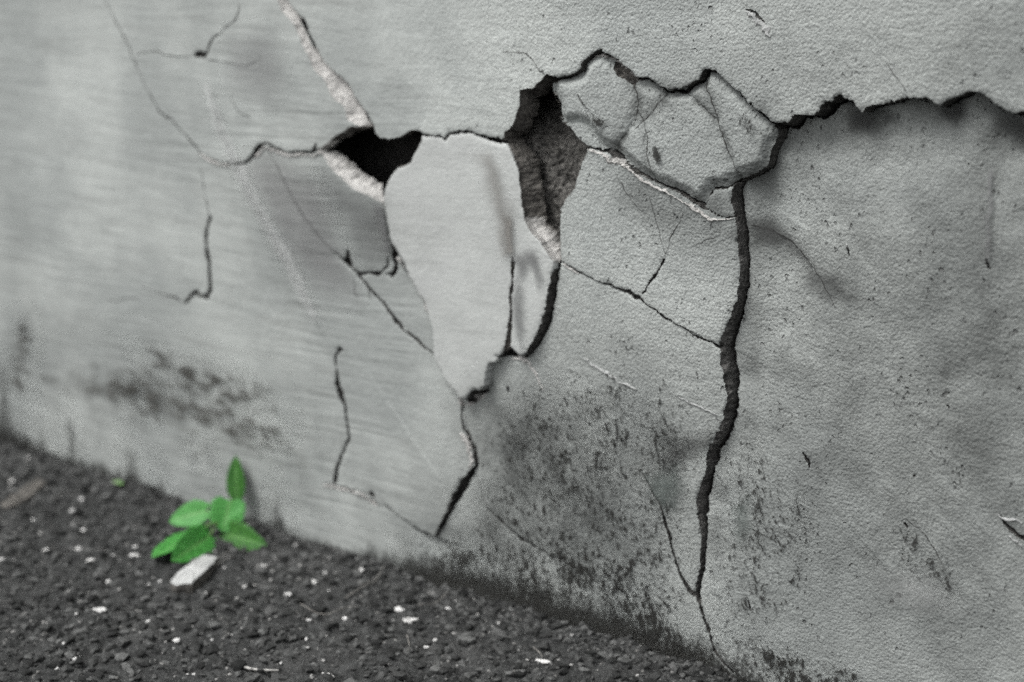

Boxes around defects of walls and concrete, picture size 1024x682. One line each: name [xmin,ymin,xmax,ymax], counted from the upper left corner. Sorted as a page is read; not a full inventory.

damp [0,398,139,484]
crack [105,0,433,353]
crack [323,347,567,558]
peeling [317,74,591,399]
crack [424,130,508,144]
damp [365,362,866,682]
crack [497,49,1024,674]
damp [893,527,955,592]